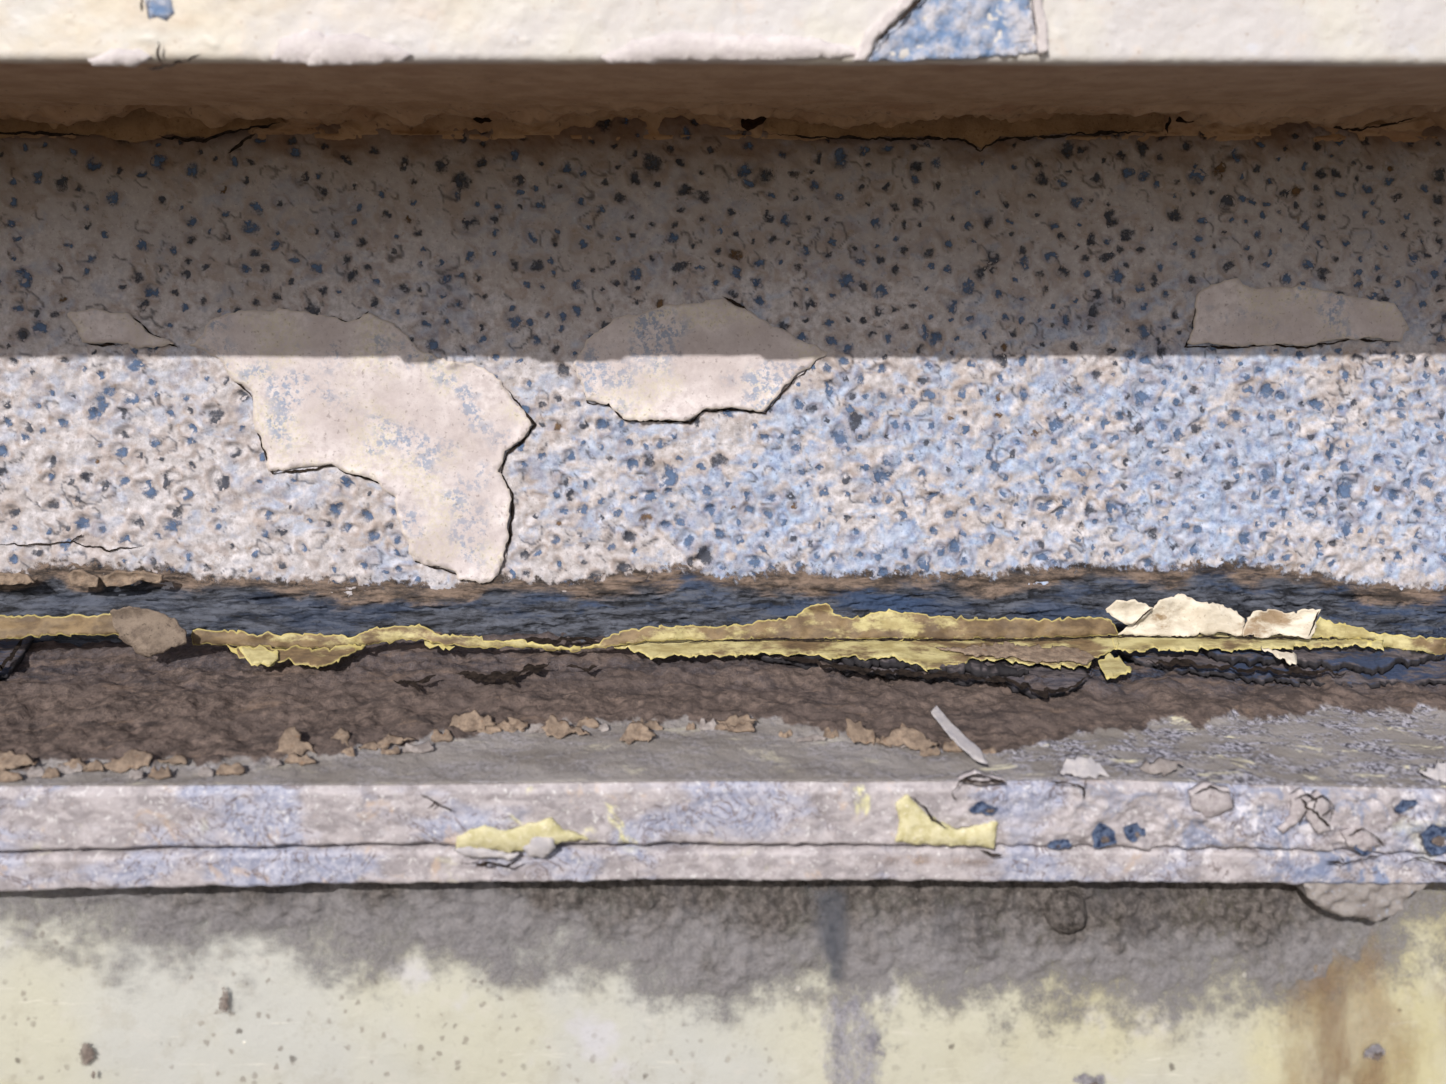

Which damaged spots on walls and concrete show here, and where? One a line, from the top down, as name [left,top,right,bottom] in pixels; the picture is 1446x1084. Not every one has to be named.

peeling [601,0,1049,64]
peeling [0,108,1446,587]
peeling [0,593,1446,680]
peeling [269,726,316,768]
peeling [331,709,663,757]
peeling [779,718,964,757]
peeling [454,817,589,868]
peeling [895,794,1002,857]
spalling [1091,822,1146,848]
spalling [1395,799,1418,813]
leakage [218,988,229,1013]
leakage [79,1043,96,1079]